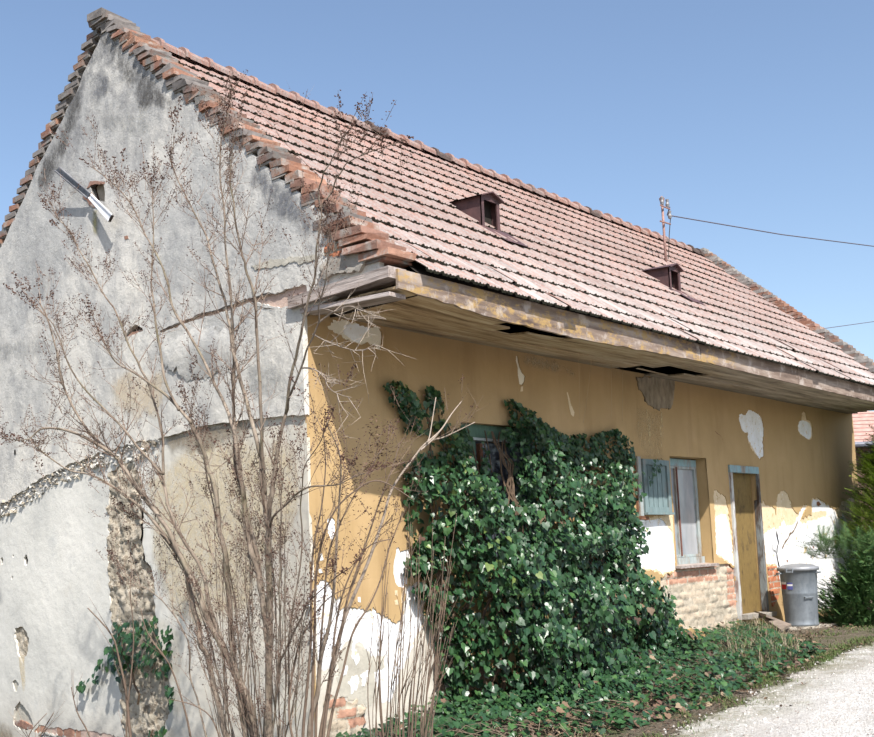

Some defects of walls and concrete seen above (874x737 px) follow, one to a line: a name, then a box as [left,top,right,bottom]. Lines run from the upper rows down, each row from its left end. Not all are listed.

damp [102,37,170,109]
damp [38,92,80,186]
peeling [327,319,382,349]
peeling [739,410,763,459]
peeling [798,411,812,440]
spalling [0,438,170,737]
flaking render [627,490,738,632]
peeling [761,491,861,610]
peeling [308,548,464,737]